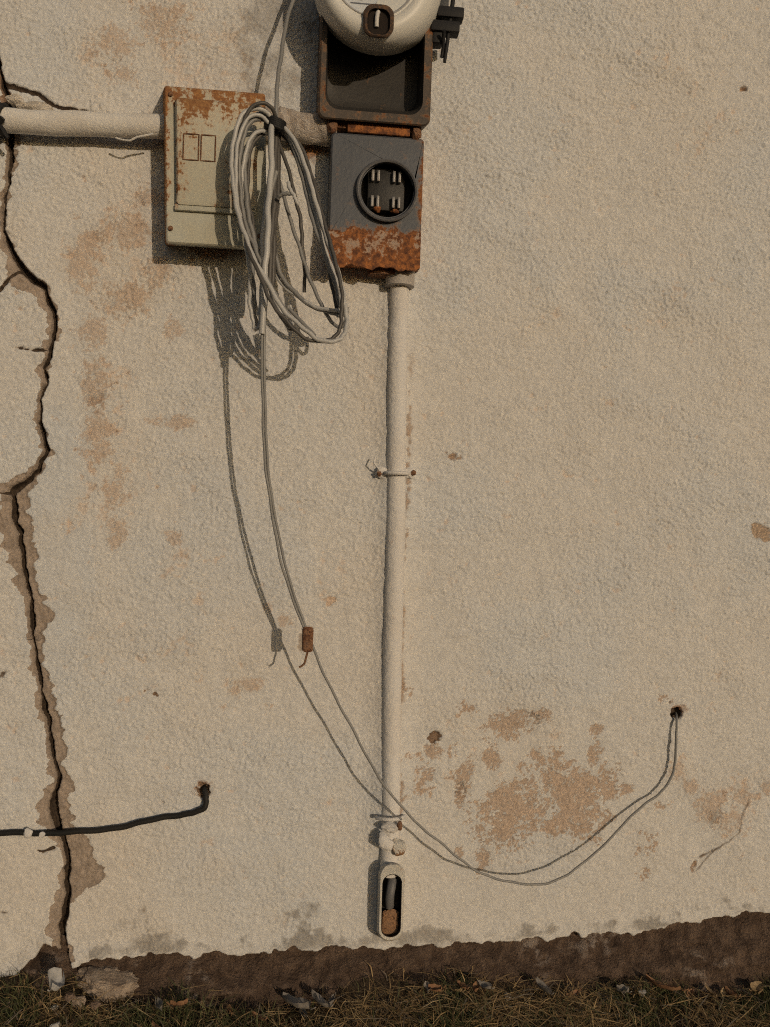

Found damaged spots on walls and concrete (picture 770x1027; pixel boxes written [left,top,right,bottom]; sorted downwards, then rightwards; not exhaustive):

crack [0,60,87,111]
corrosion [325,226,421,272]
crack [0,133,106,963]
peeling [405,700,633,879]
spalling [64,992,102,1010]